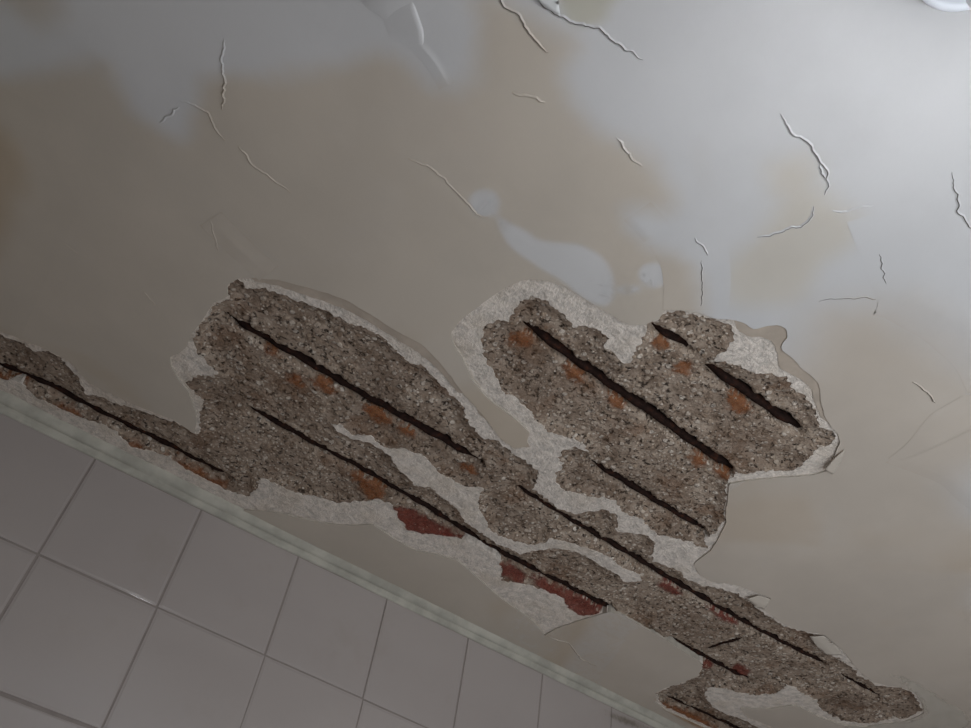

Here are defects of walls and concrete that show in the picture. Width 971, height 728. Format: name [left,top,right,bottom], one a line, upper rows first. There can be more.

crack [499,0,643,61]
crack [159,38,290,193]
crack [757,114,830,238]
crack [951,172,971,229]
corrosion [351,470,385,499]
corrosion [394,507,453,537]
spalling [0,278,924,728]
corrosion [500,563,603,616]